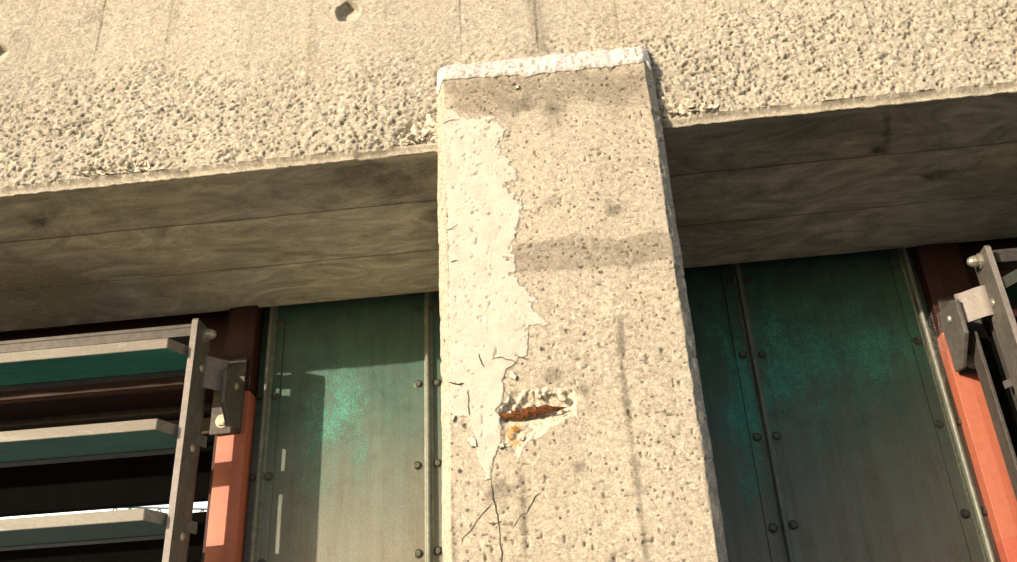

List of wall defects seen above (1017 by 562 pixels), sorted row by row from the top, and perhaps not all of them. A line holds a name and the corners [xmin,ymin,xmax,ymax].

peeling [391,109,579,480]
crack [460,482,541,562]